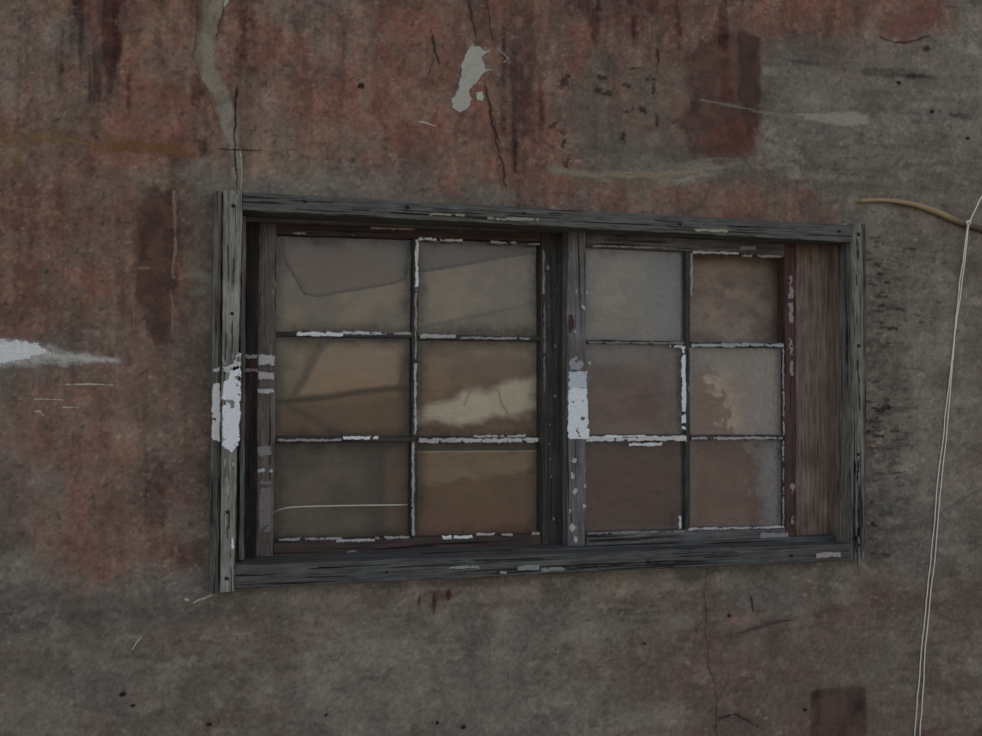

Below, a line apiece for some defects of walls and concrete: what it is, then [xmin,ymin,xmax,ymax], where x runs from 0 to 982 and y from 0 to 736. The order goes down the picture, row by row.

crack [194,0,260,191]
crack [696,576,761,736]